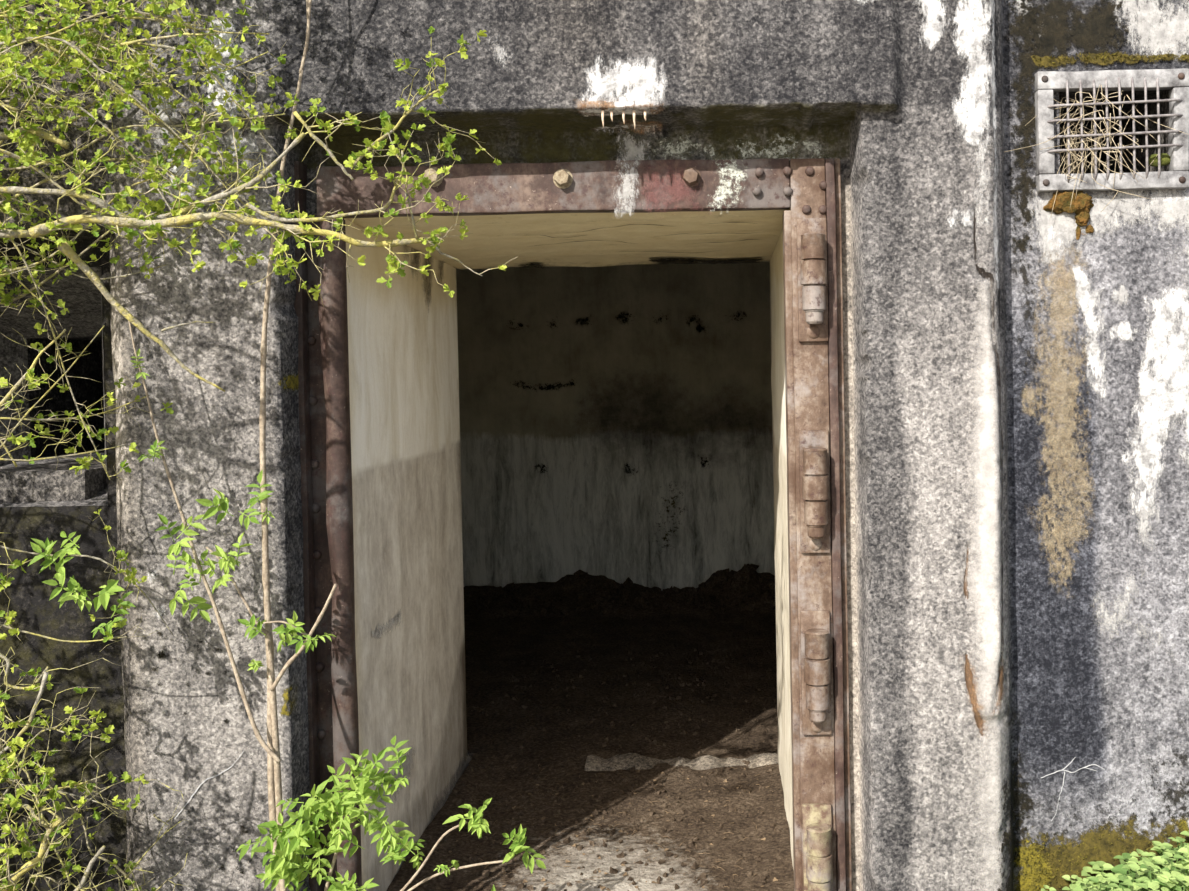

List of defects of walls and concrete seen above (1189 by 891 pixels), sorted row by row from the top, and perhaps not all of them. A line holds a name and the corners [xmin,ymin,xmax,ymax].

damp [578,56,714,216]
damp [737,136,825,159]
damp [917,0,1189,397]
crack [962,547,970,599]
crack [965,212,1004,736]
damp [1072,266,1189,550]